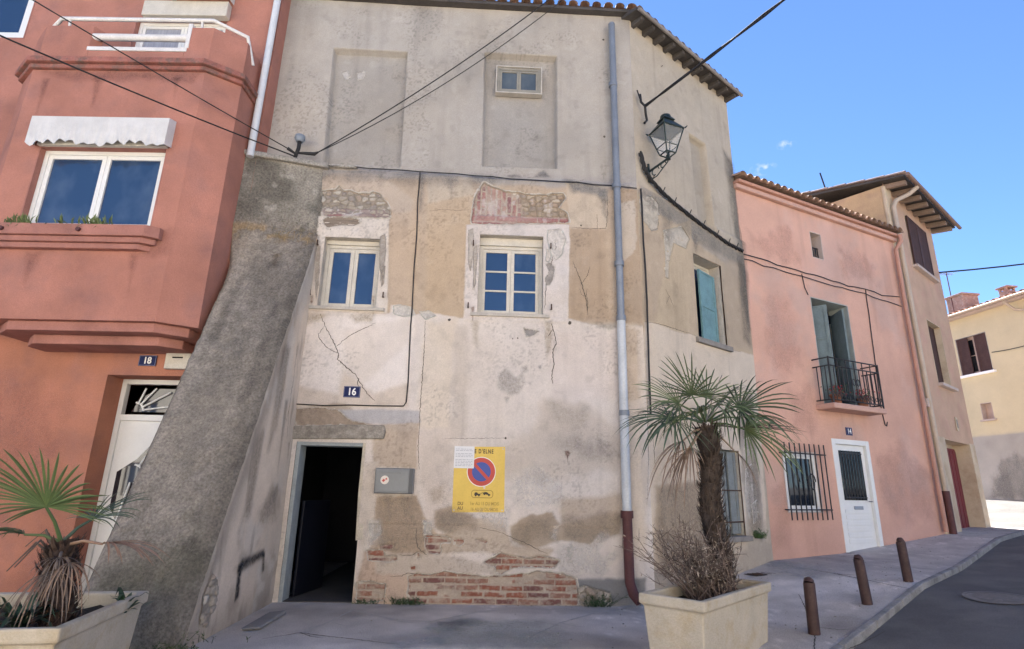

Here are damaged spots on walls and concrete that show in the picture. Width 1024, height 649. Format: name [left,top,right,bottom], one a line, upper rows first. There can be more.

flaking render [318,185,391,228]
flaking render [467,181,582,290]
crack [318,314,375,401]
flaking render [366,545,398,563]
flaking render [406,534,612,606]